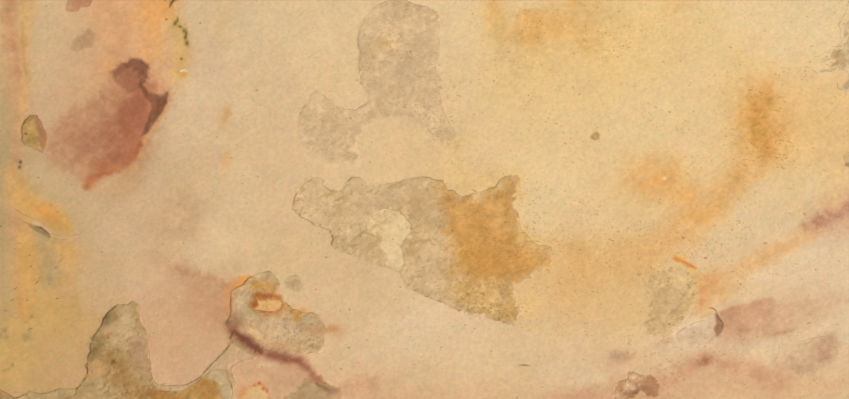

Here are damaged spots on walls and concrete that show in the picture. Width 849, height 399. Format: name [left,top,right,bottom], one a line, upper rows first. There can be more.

spalling [21,115,48,153]
leakage [44,0,194,203]
peeling [297,0,462,166]
peeling [805,1,849,104]
peeling [292,175,559,330]
leakage [524,114,849,399]
peeling [0,271,334,399]